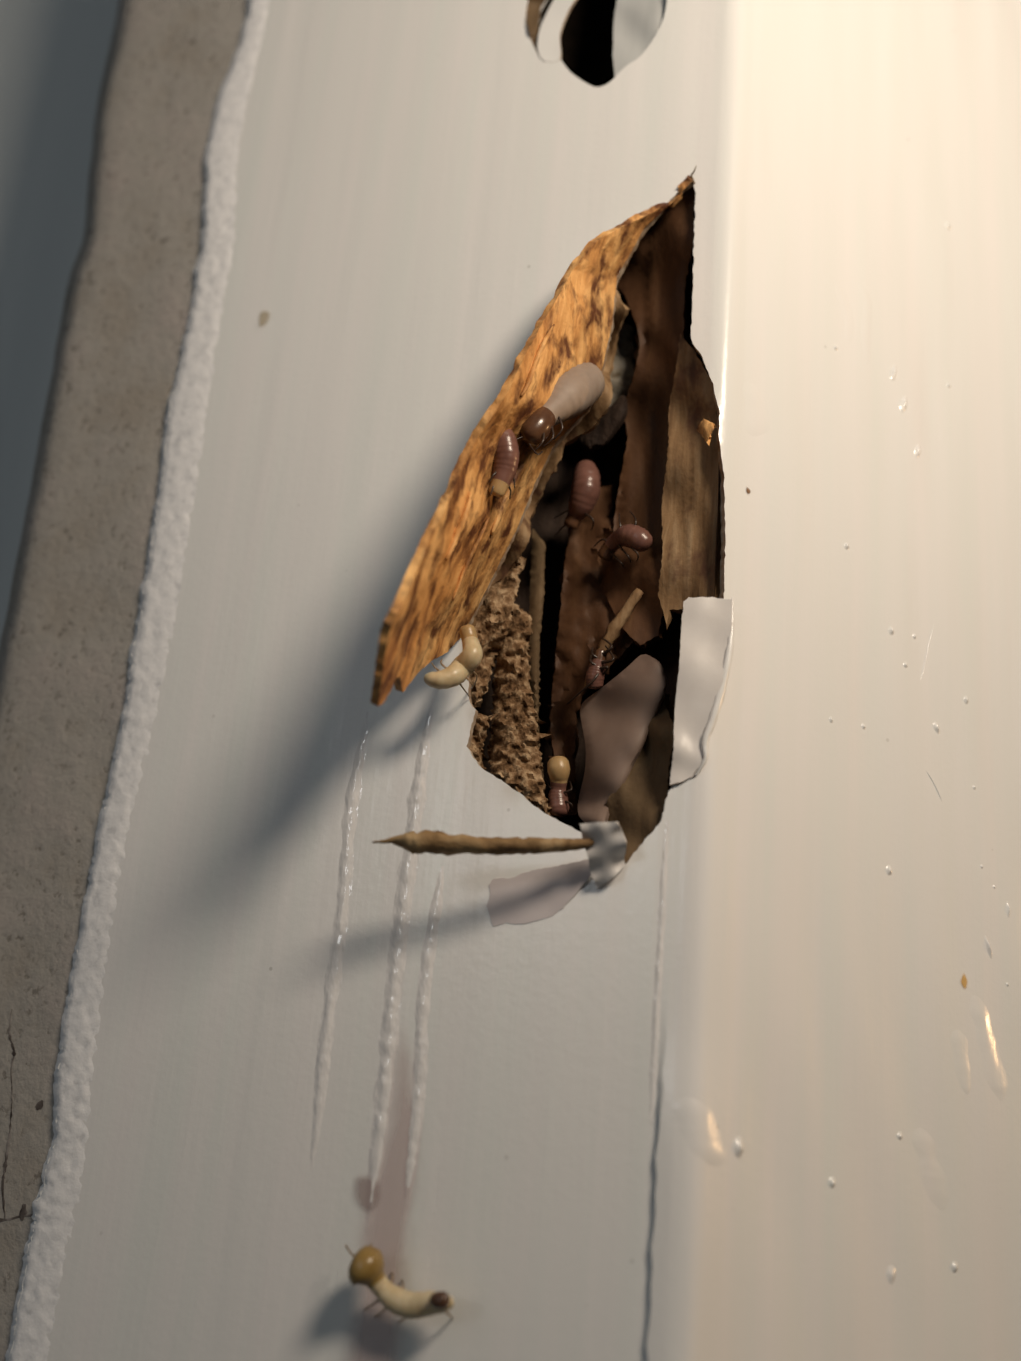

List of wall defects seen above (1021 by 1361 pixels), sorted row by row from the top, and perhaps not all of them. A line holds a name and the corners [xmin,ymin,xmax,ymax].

peeling [612,0,667,77]
peeling [696,418,717,445]
peeling [670,597,733,786]
peeling [580,822,627,888]
crack [0,1009,33,1222]